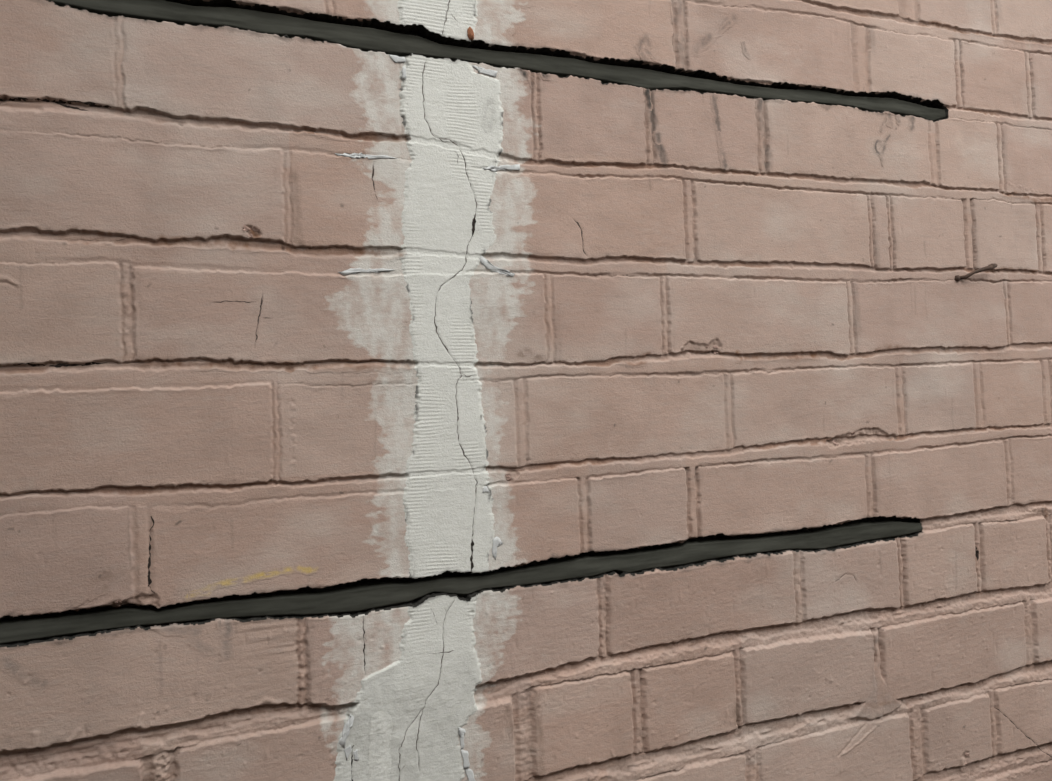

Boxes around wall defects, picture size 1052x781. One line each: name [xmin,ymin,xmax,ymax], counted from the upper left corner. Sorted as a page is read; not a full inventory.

crack [0,97,111,111]
crack [220,294,267,342]
crack [422,65,478,572]
crack [13,361,103,369]
crack [147,516,155,593]
crack [398,597,458,781]